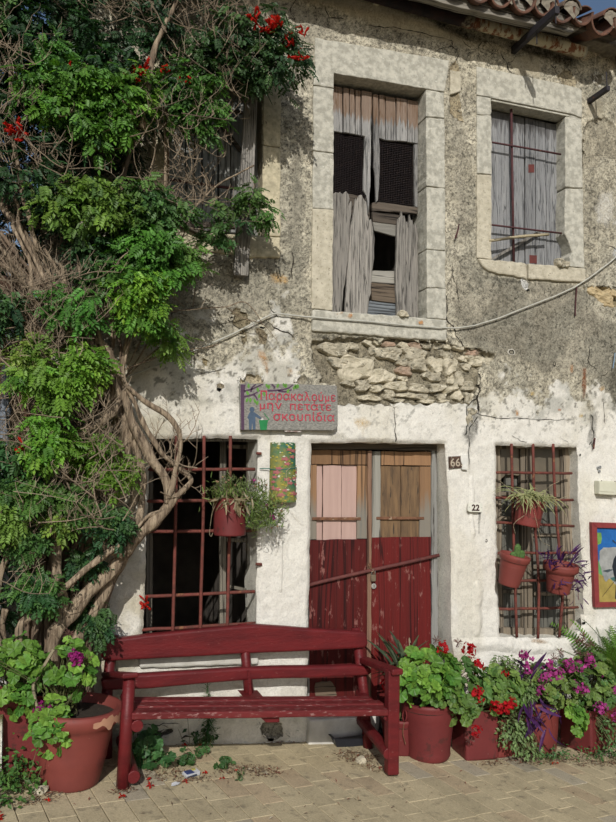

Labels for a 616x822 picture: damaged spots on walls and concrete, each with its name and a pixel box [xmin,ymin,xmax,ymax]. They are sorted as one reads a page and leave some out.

crack [446,265,564,462]
flaking render [583,284,616,308]